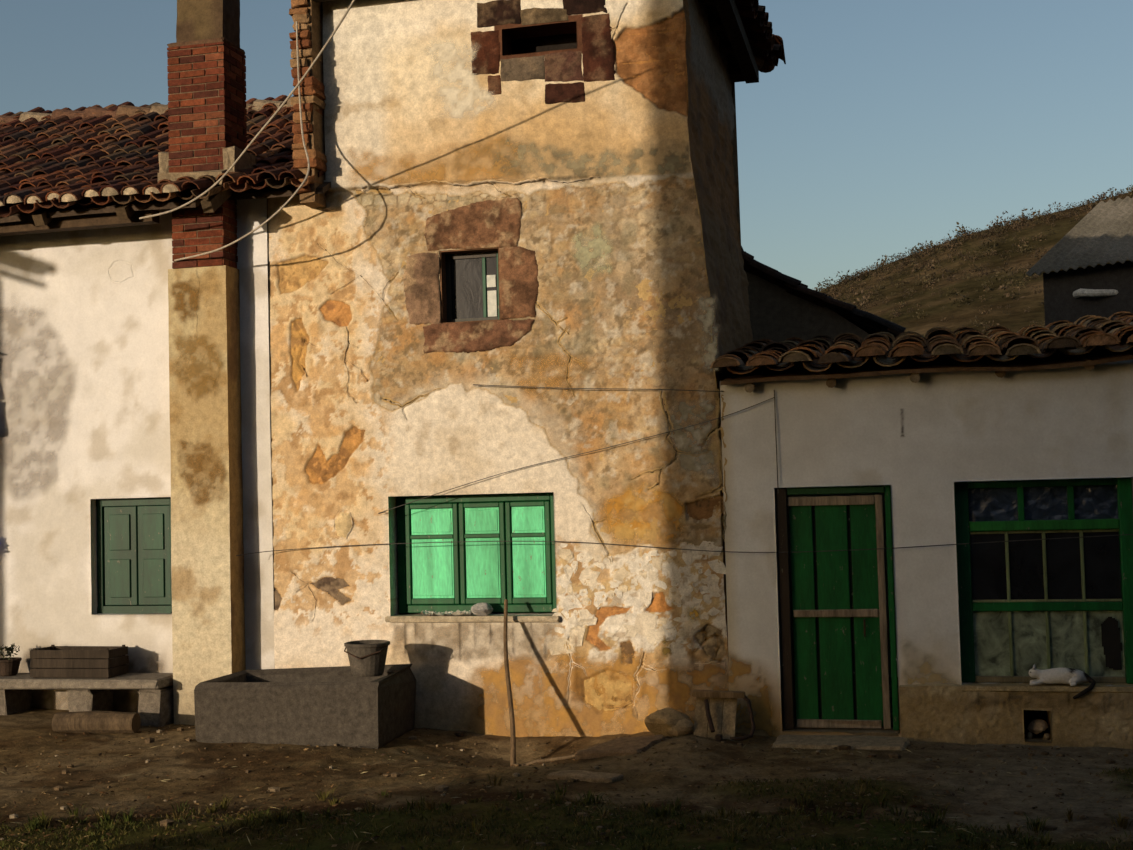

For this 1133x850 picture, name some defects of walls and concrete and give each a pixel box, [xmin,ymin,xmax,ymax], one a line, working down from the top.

damp [173,282,198,320]
spalling [277,255,328,294]
spalling [320,300,352,327]
damp [176,338,222,397]
spalling [291,318,309,391]
spalling [306,426,365,484]
crack [630,388,727,542]
crack [582,504,619,560]
peeling [547,541,726,711]